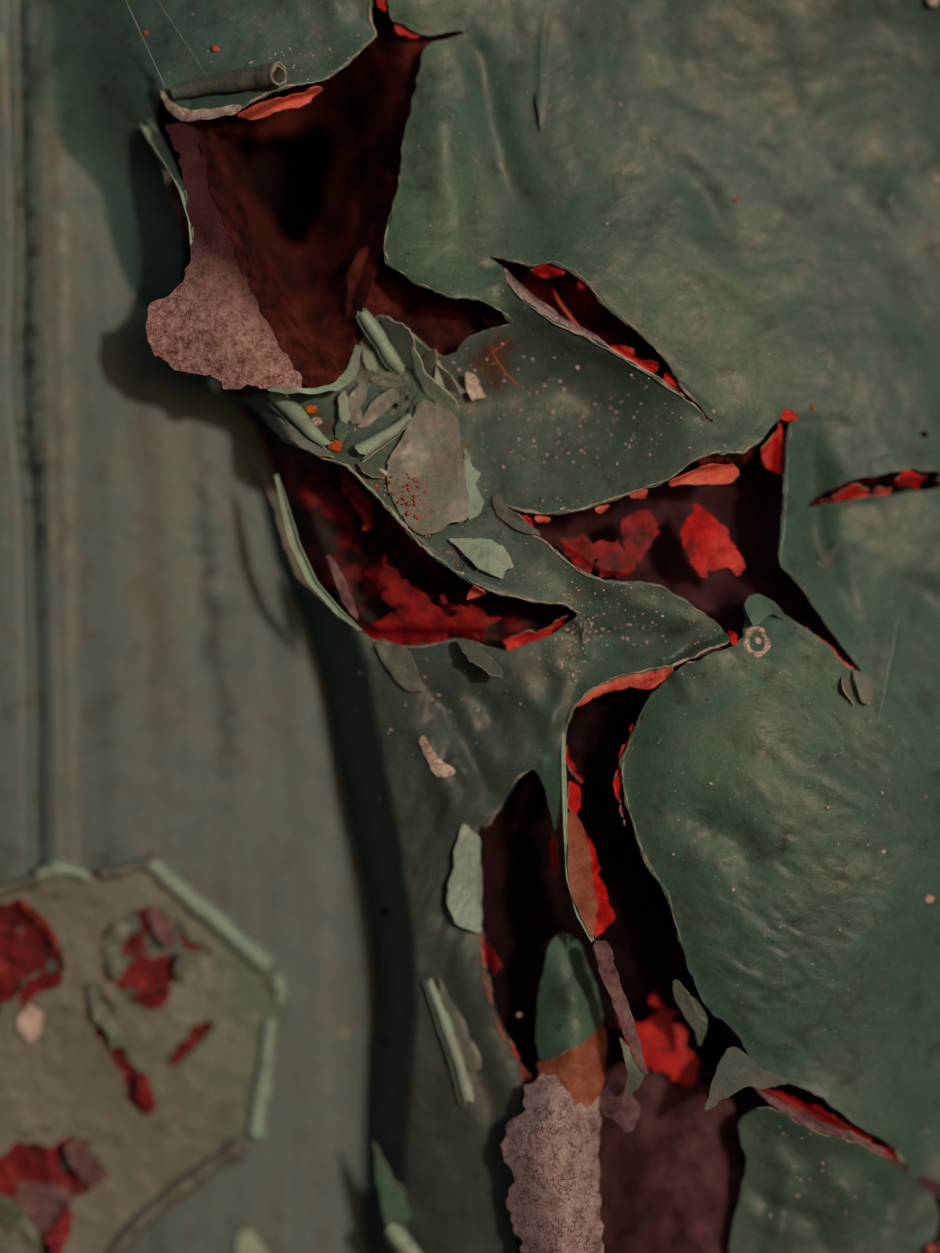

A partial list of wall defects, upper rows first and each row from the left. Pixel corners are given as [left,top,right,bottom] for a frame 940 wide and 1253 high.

spalling [184,0,486,428]
spalling [472,300,510,328]
spalling [491,258,678,383]
spalling [220,381,576,650]
spalling [808,470,940,508]
spalling [446,419,873,1114]
peeling [0,898,66,1042]
peeling [83,905,216,1116]
spalling [731,1087,777,1123]
peeling [0,1137,109,1253]
peeling [236,1230,267,1253]
spalling [923,1193,940,1253]